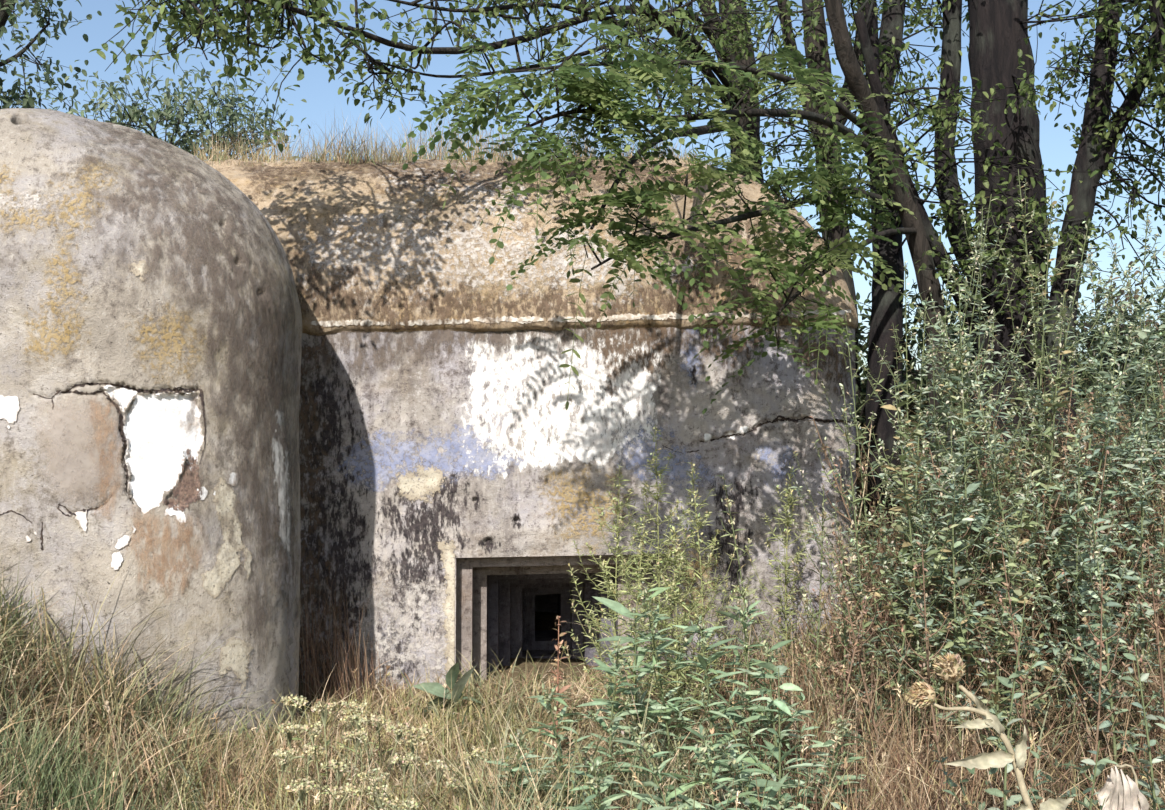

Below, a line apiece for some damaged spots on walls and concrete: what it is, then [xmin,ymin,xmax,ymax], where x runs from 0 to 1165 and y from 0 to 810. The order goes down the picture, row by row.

peeling [0,395,20,429]
spalling [101,385,253,598]
leakage [84,120,856,700]
peeling [311,312,765,492]
crack [663,415,854,454]
spalling [783,309,851,317]